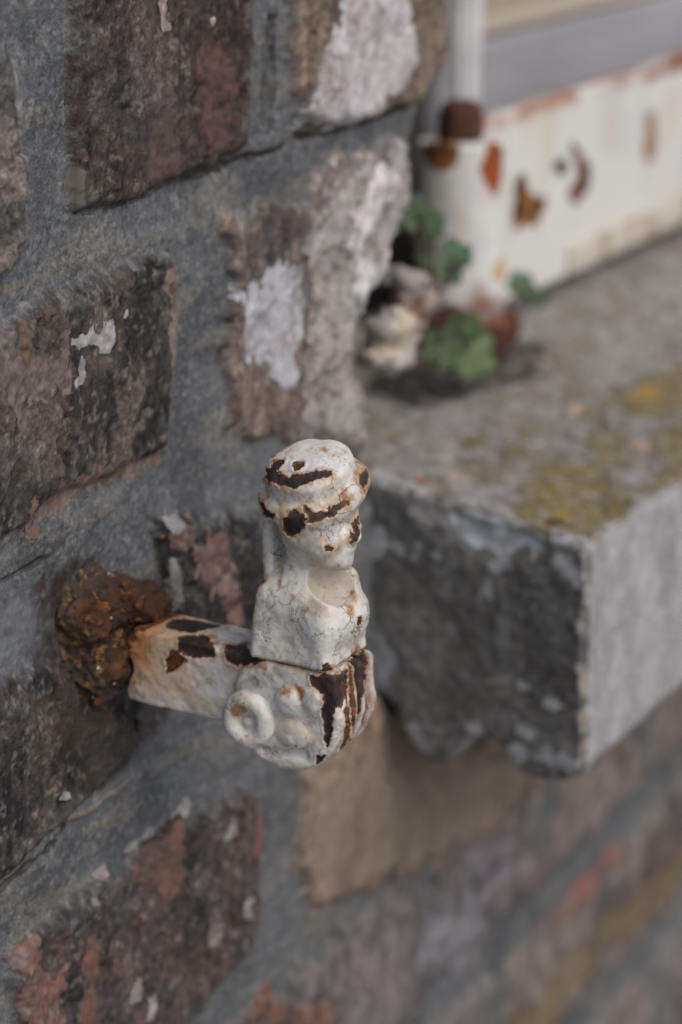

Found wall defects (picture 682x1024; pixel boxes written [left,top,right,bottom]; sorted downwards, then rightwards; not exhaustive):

spalling [159,508,264,674]
peeling [265,460,332,489]
peeling [260,500,350,537]
peeling [350,516,360,545]
corrosion [33,559,169,792]
peeling [309,634,398,764]